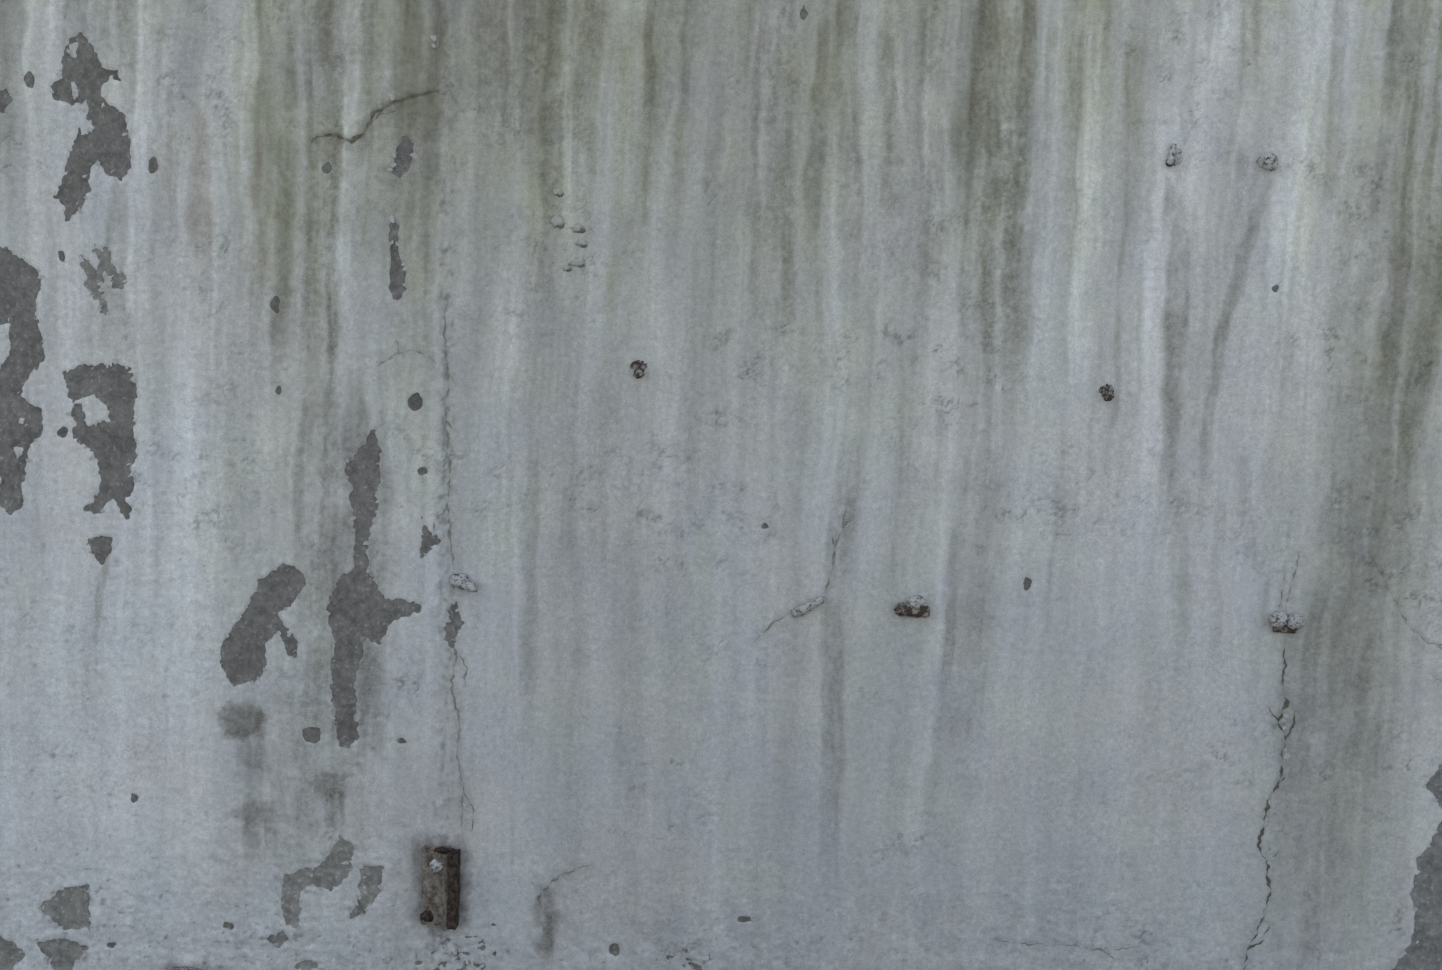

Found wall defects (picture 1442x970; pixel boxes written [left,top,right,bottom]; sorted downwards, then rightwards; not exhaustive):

peeling [24,32,131,221]
crack [310,1,441,150]
peeling [0,244,138,520]
peeling [219,563,306,686]
peeling [302,429,421,749]
crack [1279,550,1300,610]
crack [1370,554,1442,680]
peeling [0,884,91,970]
peeling [266,835,385,948]
rust [420,910,433,922]
crack [1244,646,1295,969]
peeling [1392,765,1442,970]